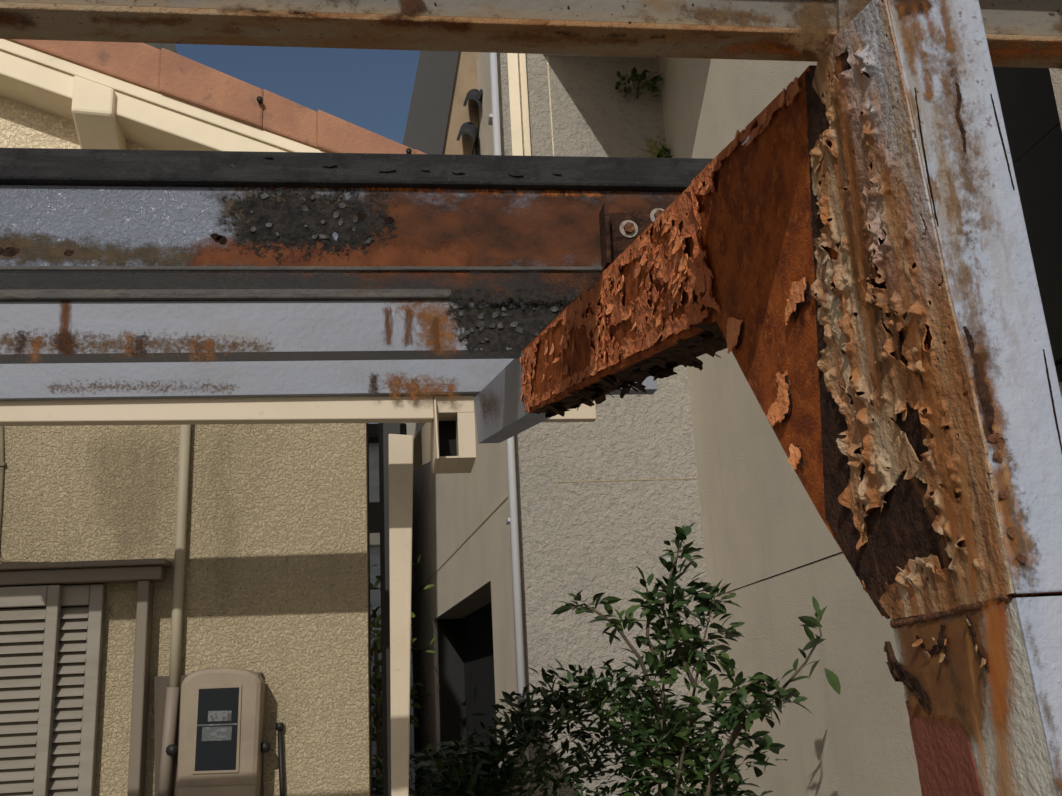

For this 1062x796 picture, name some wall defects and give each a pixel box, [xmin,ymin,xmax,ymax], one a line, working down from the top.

rust [0,12,34,27]
rust [380,0,470,32]
rust [681,3,770,25]
rust [786,0,872,56]
peeling [834,50,852,80]
rust [988,9,1062,69]
rust [832,64,883,411]
rust [0,186,683,361]
rust [895,0,1038,589]
peeling [445,66,961,619]
rust [884,253,1020,796]